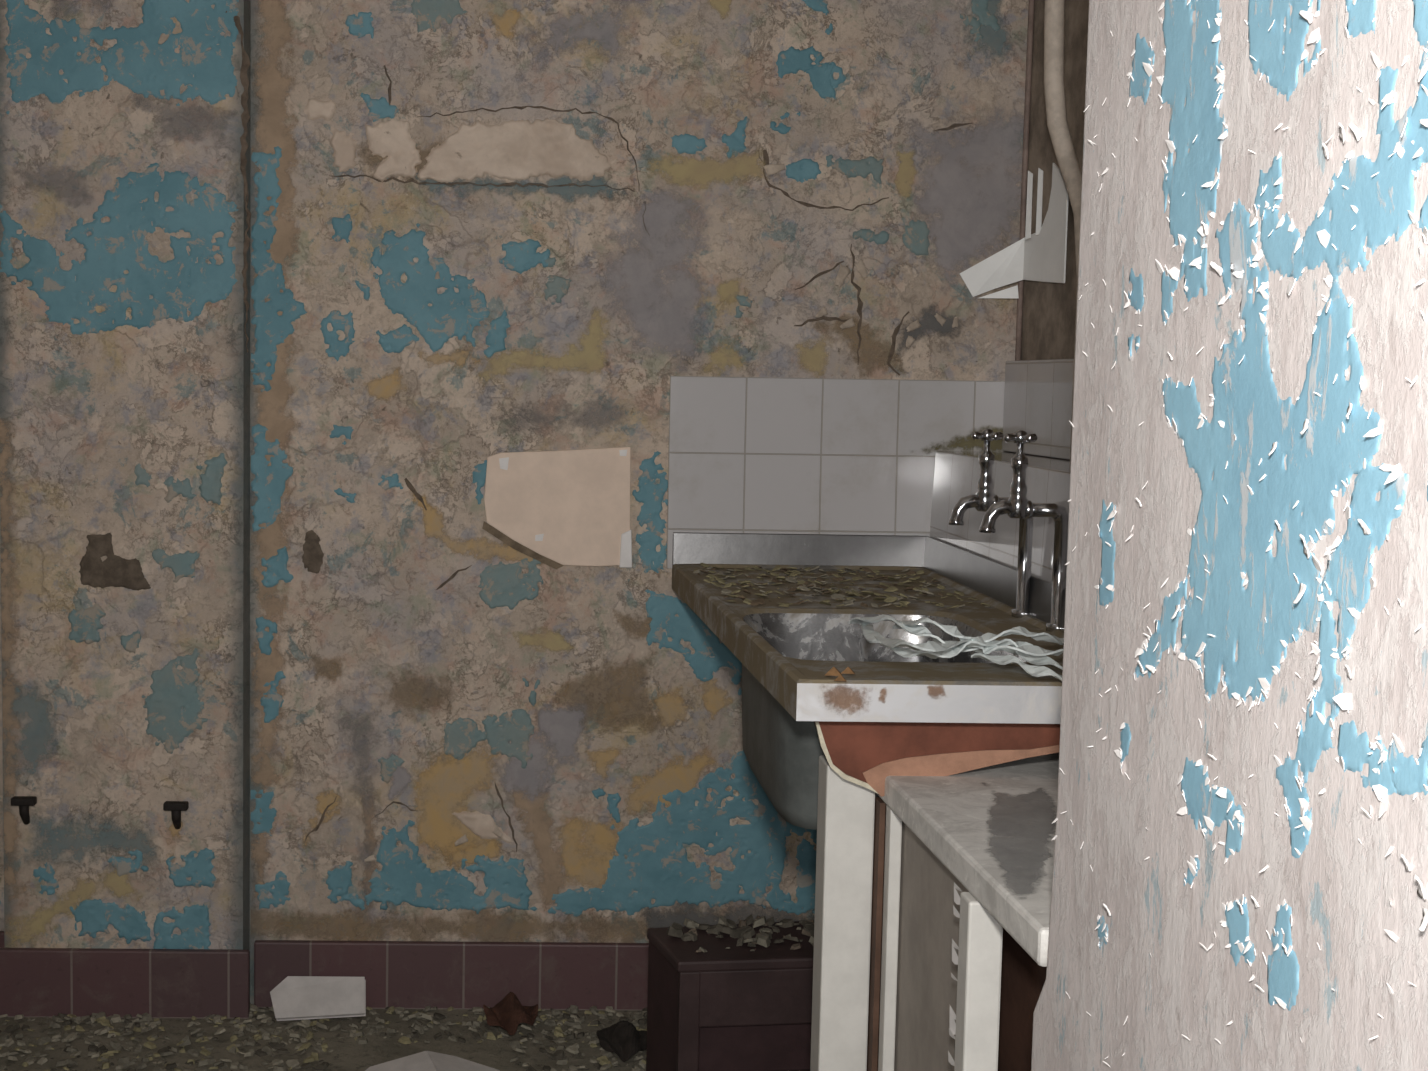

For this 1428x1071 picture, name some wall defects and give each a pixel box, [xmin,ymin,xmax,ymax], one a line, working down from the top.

peeling [4,0,239,115]
crack [333,65,650,236]
crack [934,123,972,131]
peeling [355,223,510,358]
crack [758,150,910,376]
peeling [1110,0,1428,858]
flaking render [68,533,200,644]
peeling [619,450,742,695]
peeling [69,848,217,949]
peeling [326,750,817,917]
peeling [1177,753,1246,888]
peeling [1199,894,1299,1011]